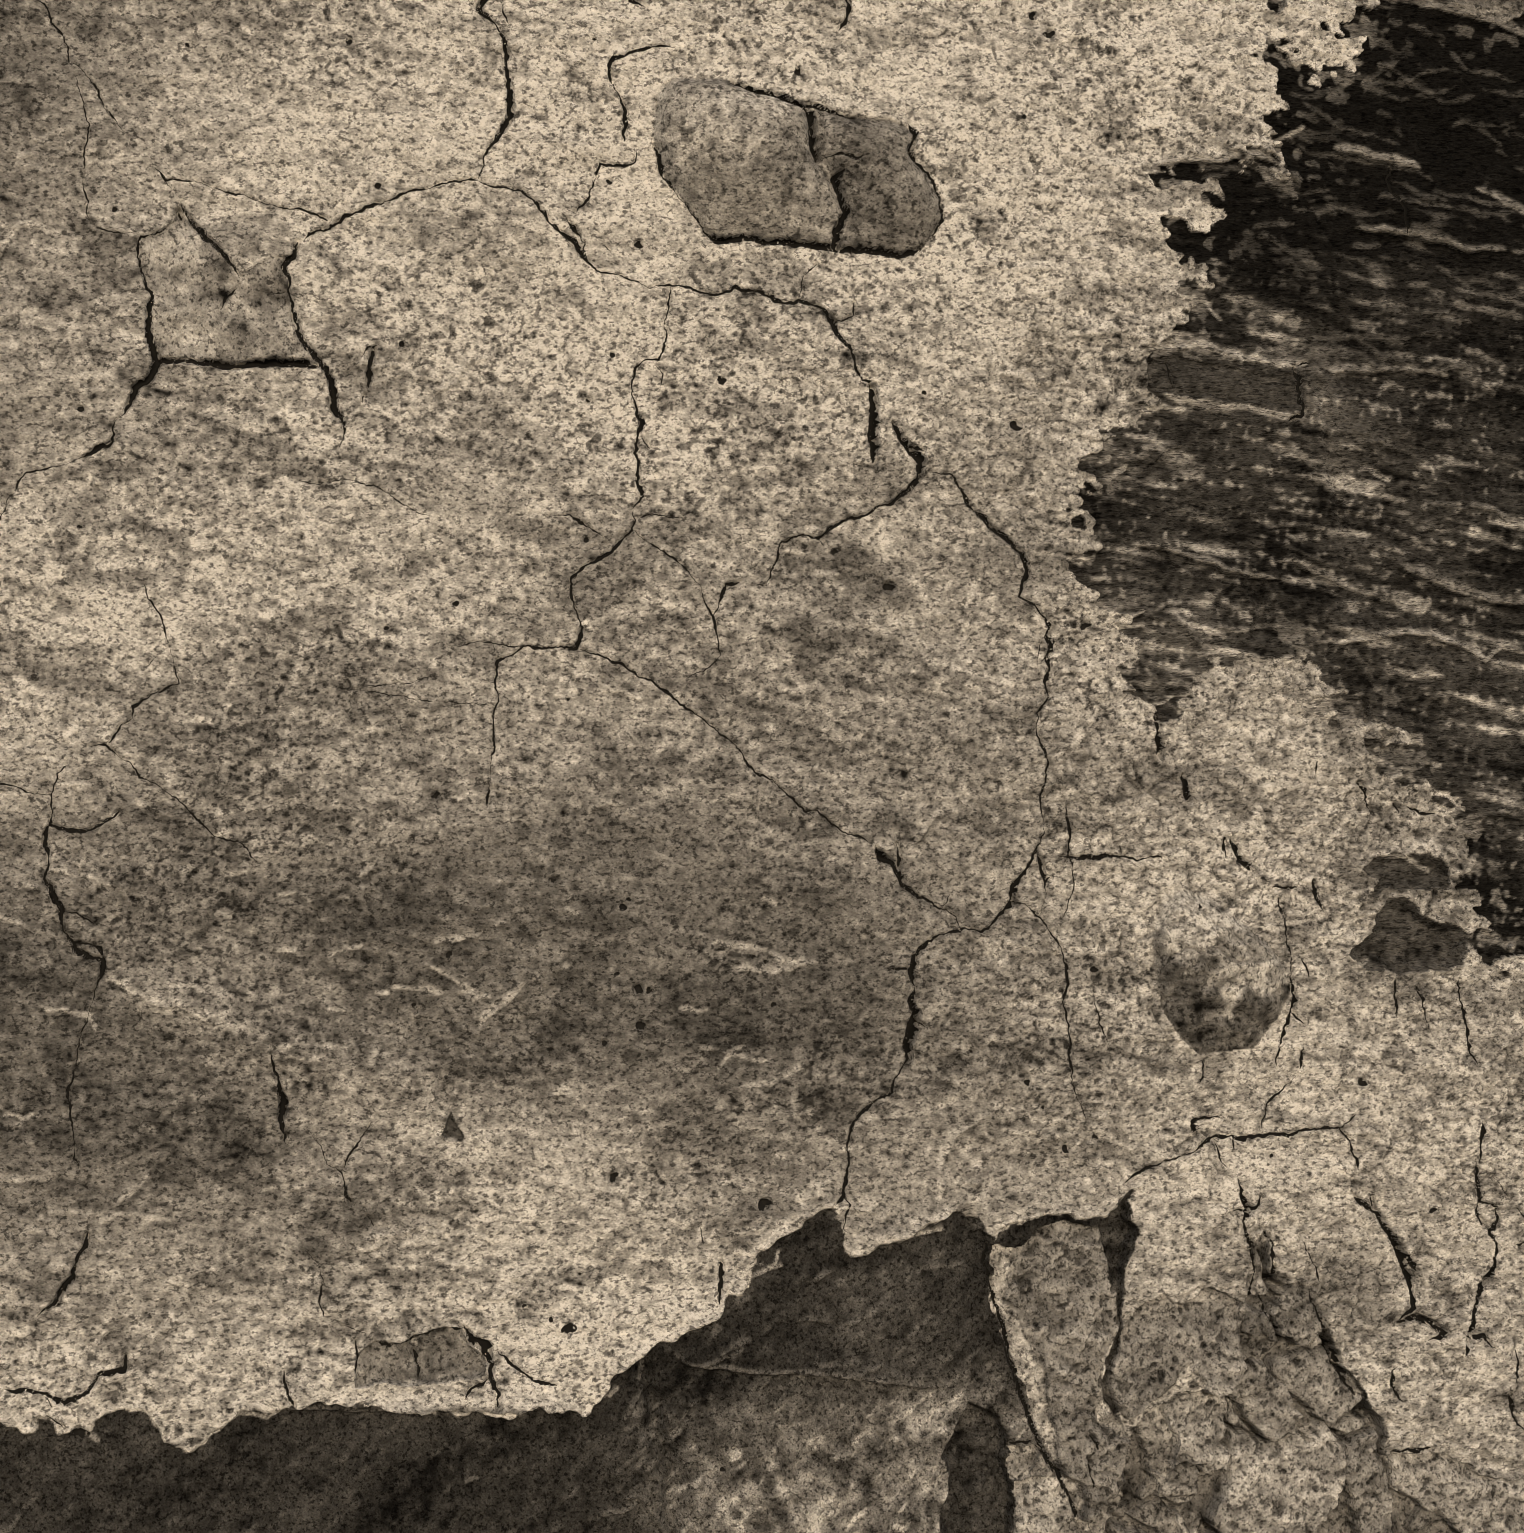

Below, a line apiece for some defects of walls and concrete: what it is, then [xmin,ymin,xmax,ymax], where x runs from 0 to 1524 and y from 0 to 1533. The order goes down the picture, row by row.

spalling [1066,0,1524,981]
crack [0,0,1162,1232]
crack [1153,716,1191,800]
crack [1356,783,1435,816]
crack [1125,837,1524,1430]
crack [40,1233,89,1313]
crack [700,1227,724,1304]
crack [4,1354,127,1427]
crack [283,1371,294,1405]
crack [307,1252,557,1407]
spalling [0,1189,1524,1533]
crack [1390,1446,1431,1454]